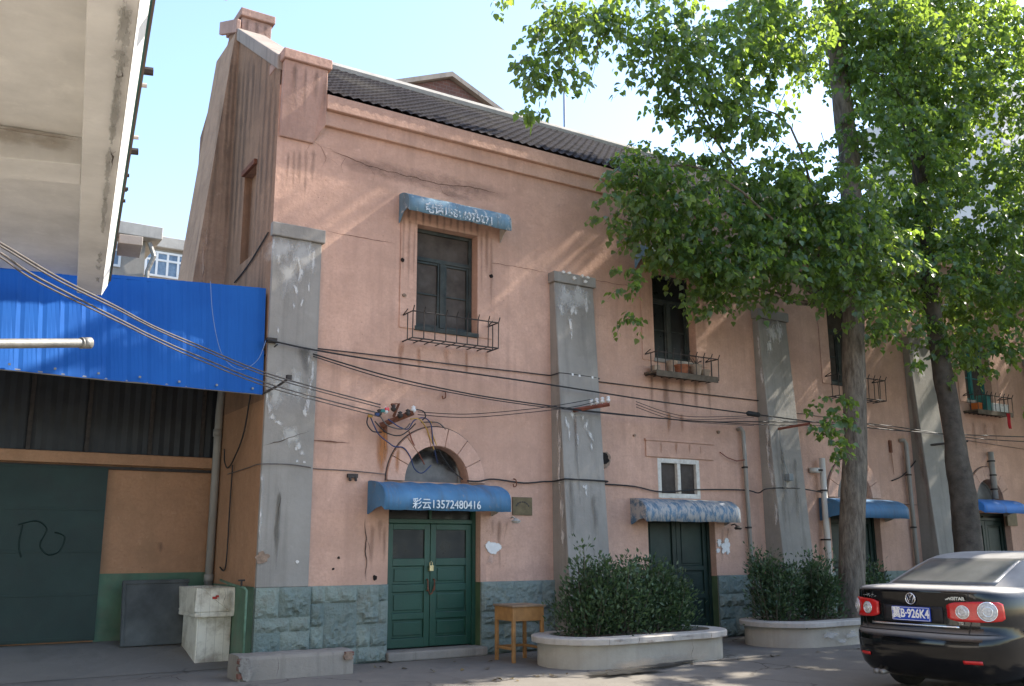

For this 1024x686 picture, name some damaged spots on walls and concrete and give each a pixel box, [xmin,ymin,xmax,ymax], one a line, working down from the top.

crack [307,142,489,196]
peeling [559,270,590,340]
rust [379,428,399,467]
peeling [716,538,730,555]